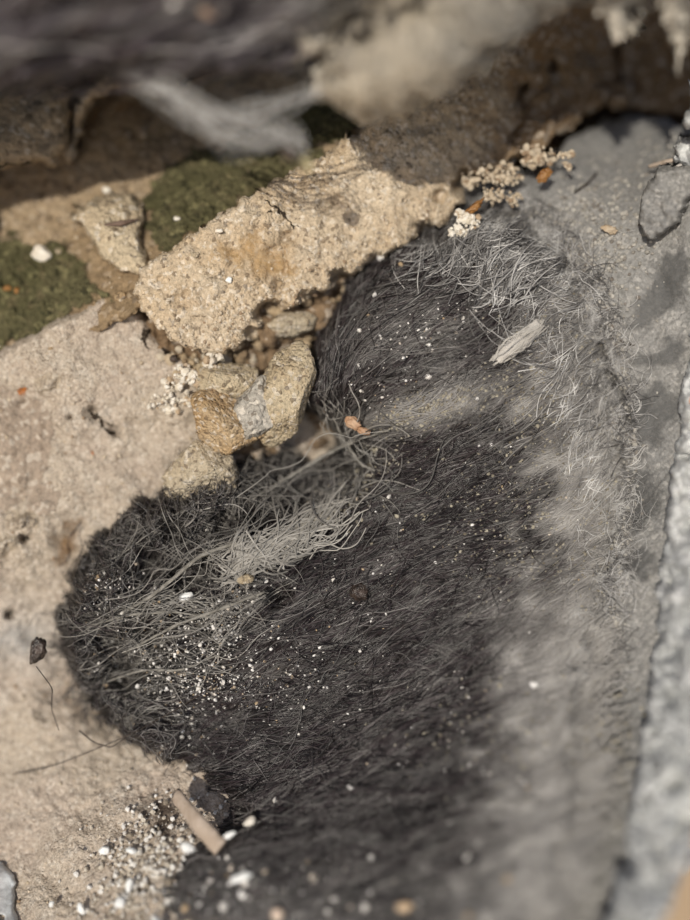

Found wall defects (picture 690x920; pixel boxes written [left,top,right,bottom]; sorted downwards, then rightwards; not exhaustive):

peeling [345,416,371,436]